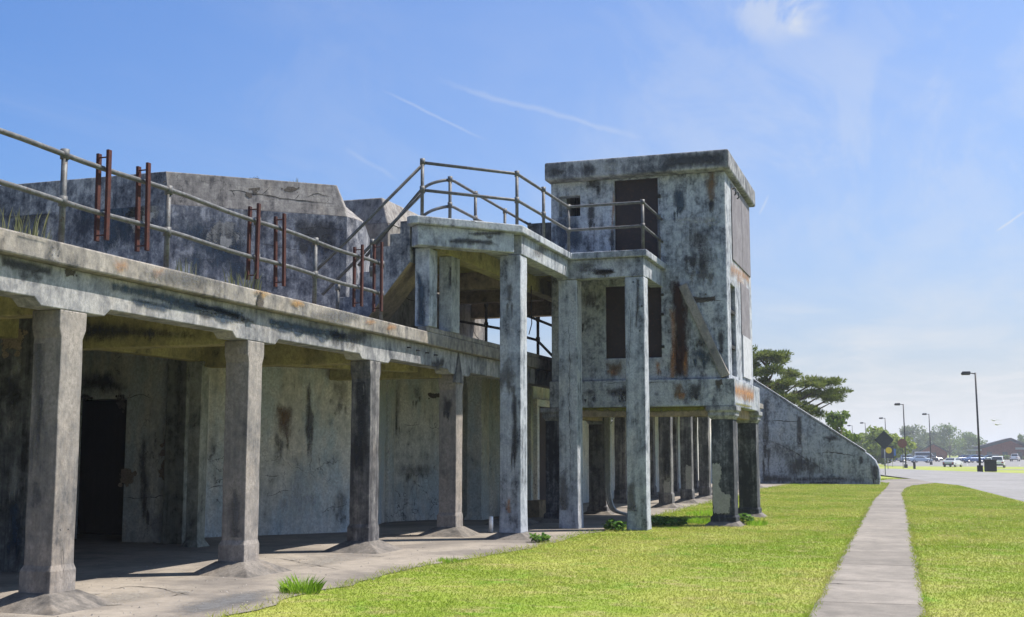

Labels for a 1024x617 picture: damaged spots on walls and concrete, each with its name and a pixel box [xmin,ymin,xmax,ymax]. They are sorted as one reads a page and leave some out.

crack [229,187,340,255]
rust [657,281,689,398]
damp [277,406,292,447]
peeling [712,463,731,514]